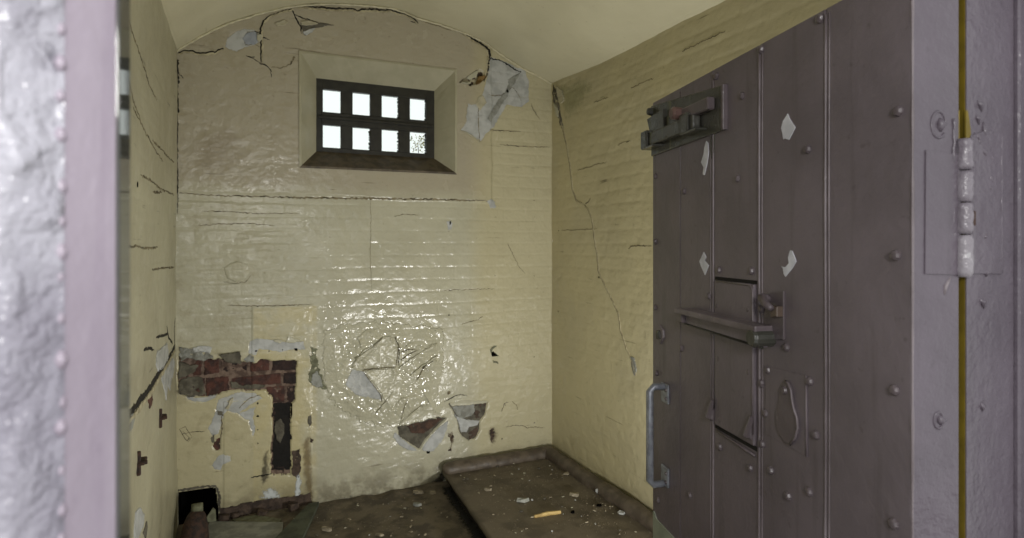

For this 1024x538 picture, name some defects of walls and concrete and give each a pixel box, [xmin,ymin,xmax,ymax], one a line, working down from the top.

peeling [225,29,262,51]
crack [130,6,521,290]
peeling [459,58,529,142]
crack [490,92,637,376]
crack [130,325,176,431]
flaking render [177,335,305,478]
flaking render [394,400,487,454]